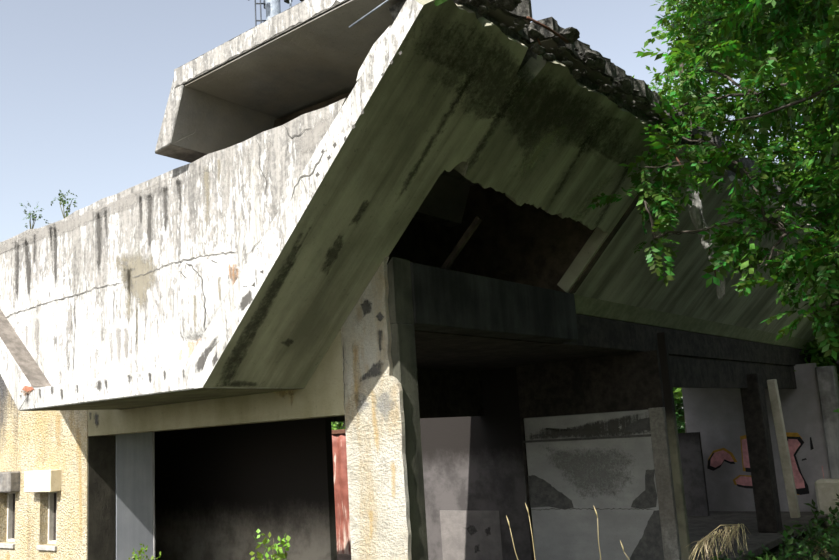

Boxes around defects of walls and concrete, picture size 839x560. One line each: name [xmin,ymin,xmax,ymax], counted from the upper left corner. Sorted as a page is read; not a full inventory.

spalling [349,0,406,28]
damp [0,173,181,297]
damp [204,149,250,223]
crack [255,137,327,214]
damp [401,29,628,226]
spalling [452,0,717,152]
damp [110,254,156,362]
crack [5,238,262,379]
damp [360,300,383,382]